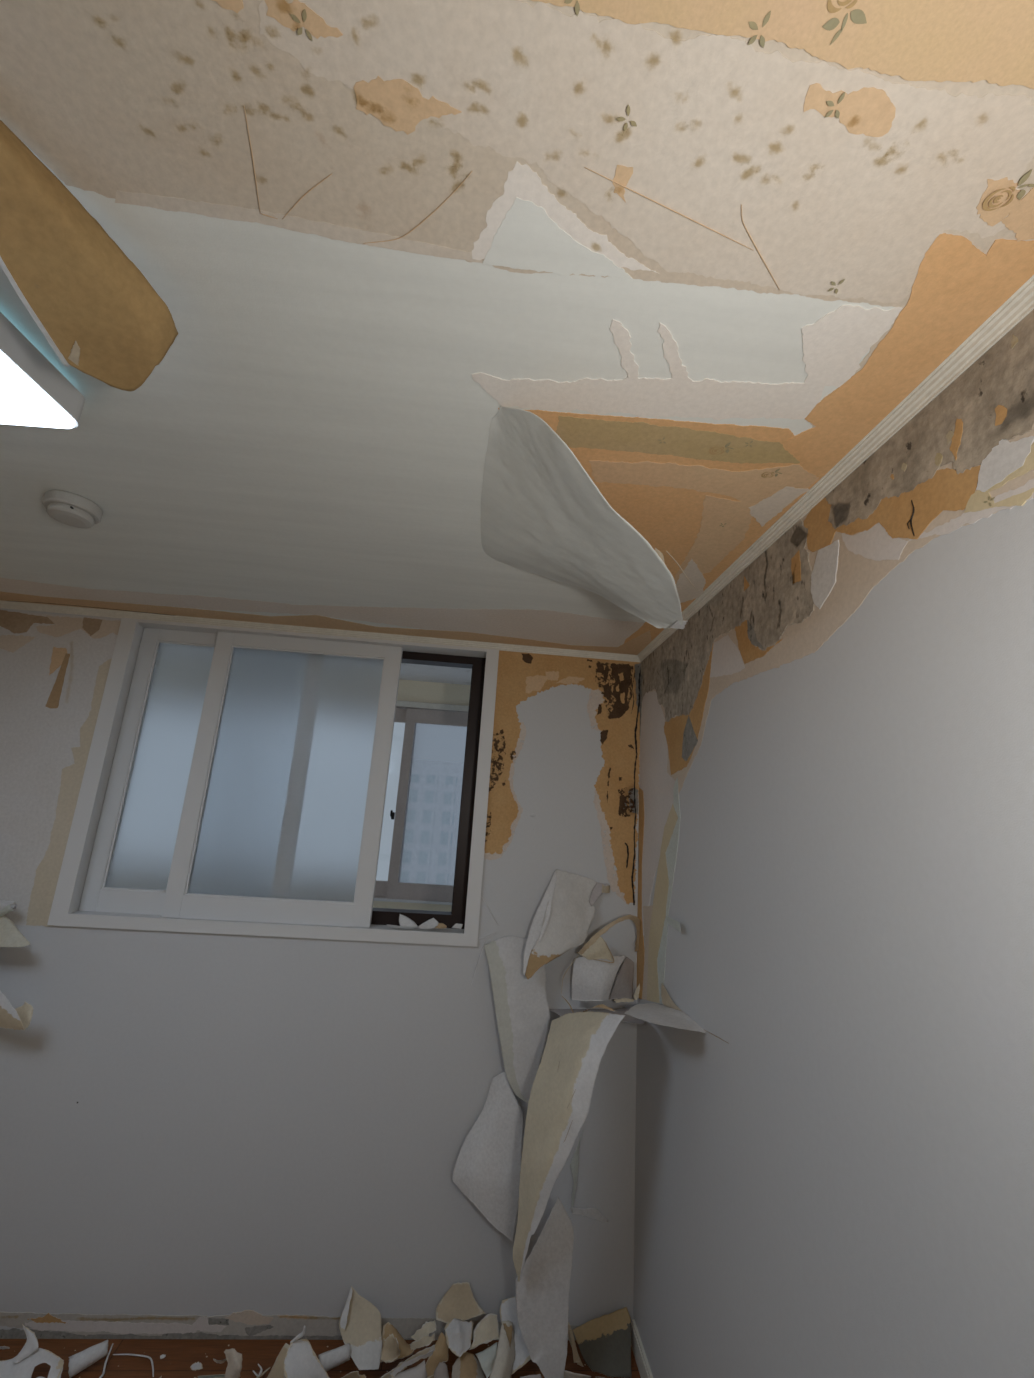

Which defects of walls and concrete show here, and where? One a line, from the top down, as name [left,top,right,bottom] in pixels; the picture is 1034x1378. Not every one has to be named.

peeling [0,309,1034,761]
peeling [637,778,681,1004]
peeling [0,1310,343,1340]
peeling [381,1317,447,1340]